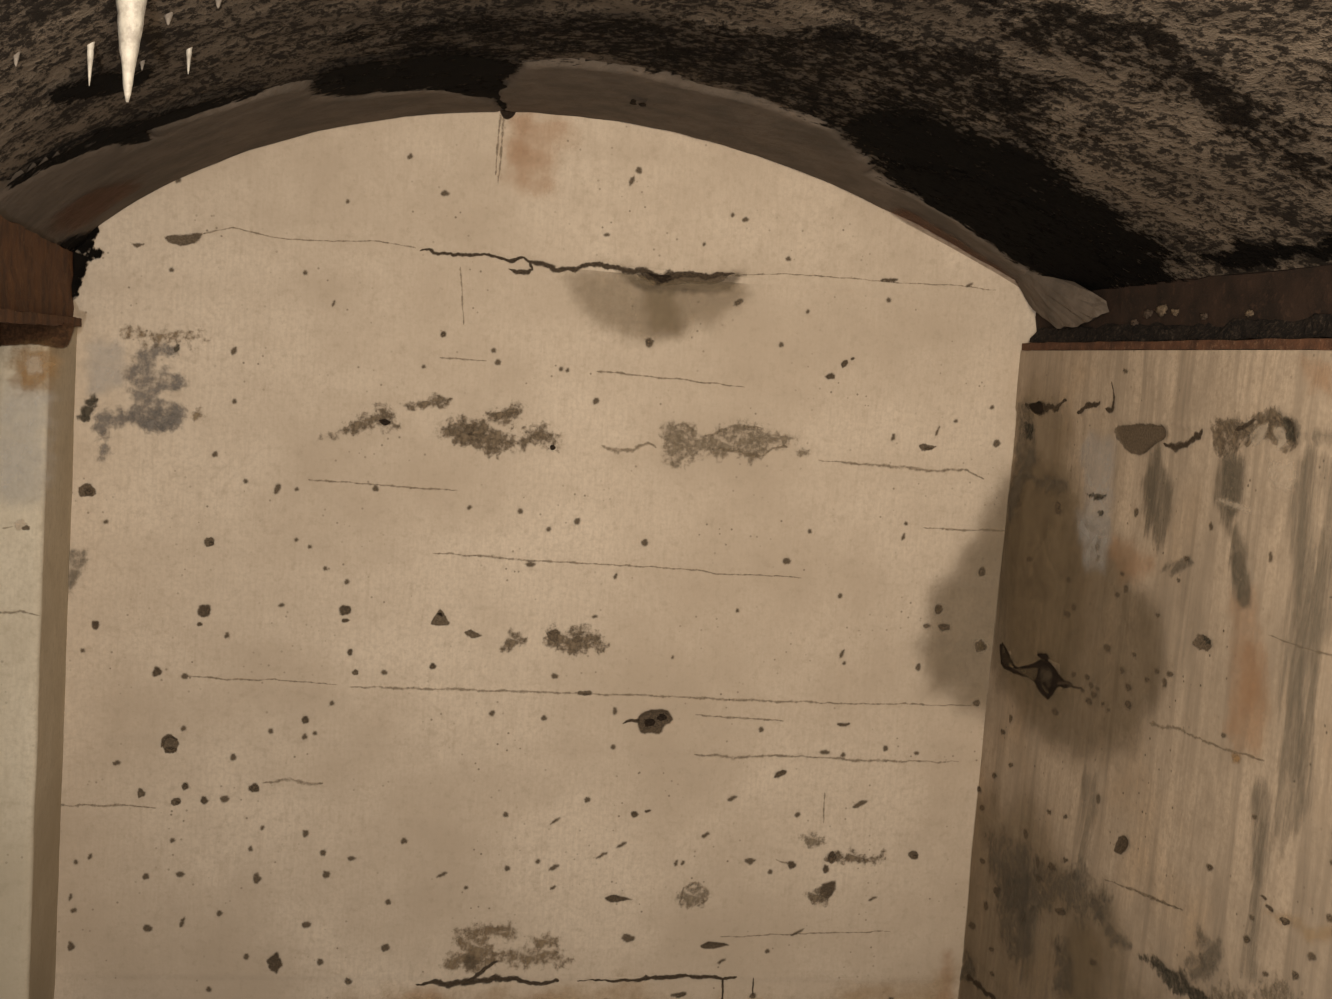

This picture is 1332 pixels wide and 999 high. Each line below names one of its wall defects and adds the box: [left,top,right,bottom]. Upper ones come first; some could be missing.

crack [420,248,931,285]
water stain [77,327,201,457]
water stain [444,923,572,972]
crack [416,960,754,999]